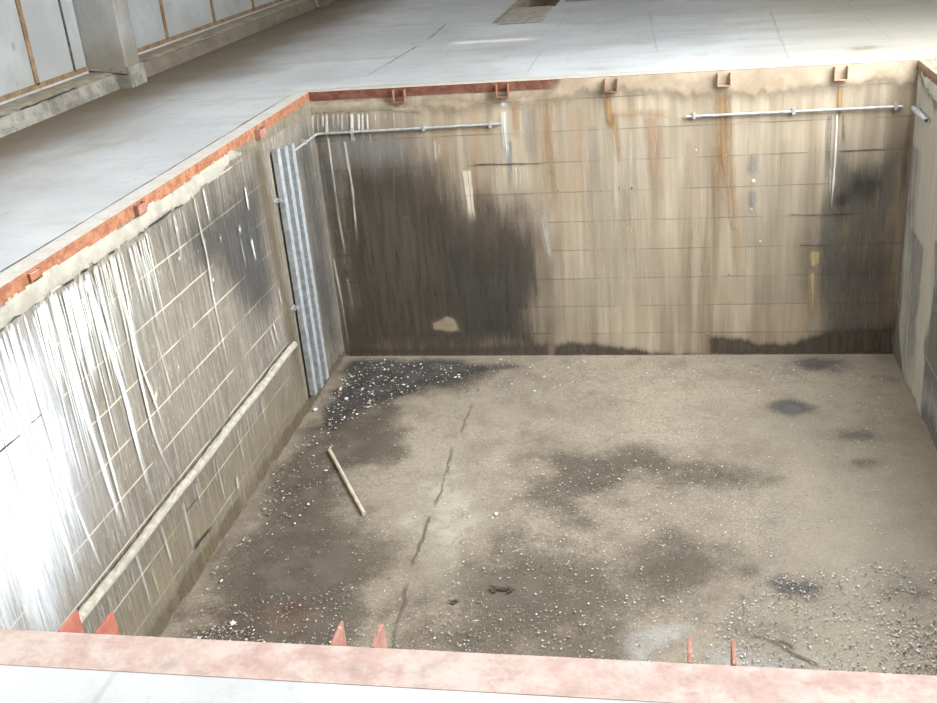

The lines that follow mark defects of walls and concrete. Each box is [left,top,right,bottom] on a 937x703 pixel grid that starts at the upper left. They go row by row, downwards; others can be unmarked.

damp [711,75,937,442]
efflorescence [0,234,161,631]
damp [120,97,670,646]
crack [392,587,407,649]
crack [412,451,452,564]
damp [395,460,719,660]
damp [534,447,738,524]